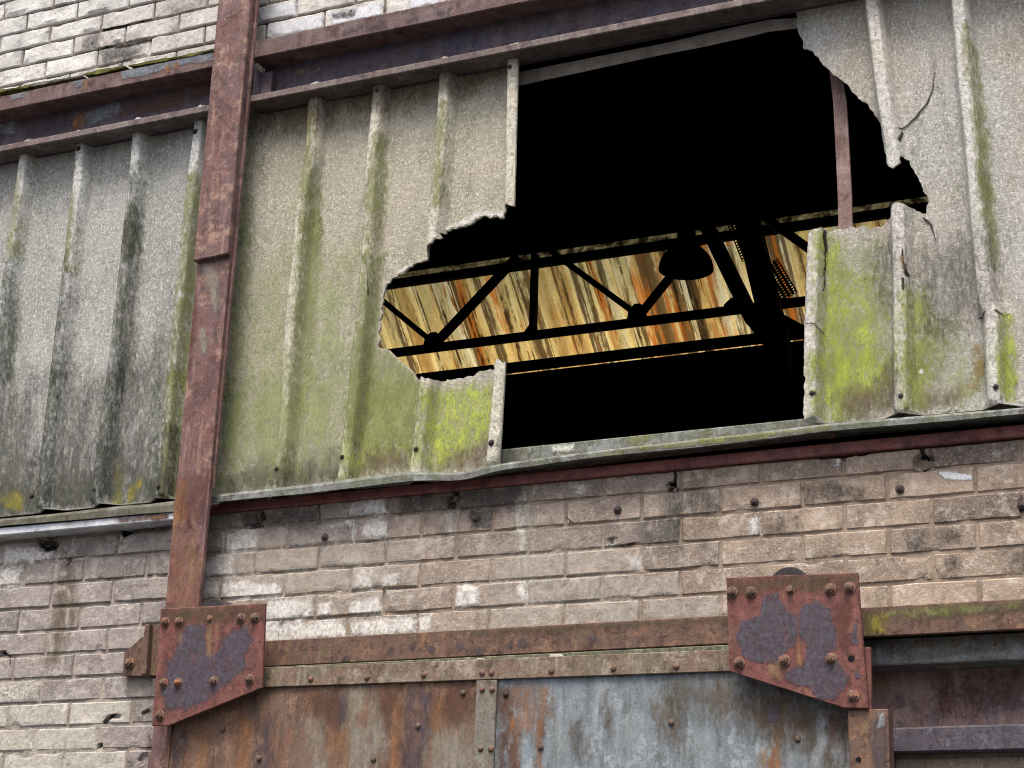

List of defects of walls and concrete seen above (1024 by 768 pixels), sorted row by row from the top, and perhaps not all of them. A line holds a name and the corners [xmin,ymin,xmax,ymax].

crack [898,59,939,142]
spalling [428,211,503,242]
leakage [978,172,999,269]
leakage [0,269,17,379]
leakage [38,259,67,486]
leakage [93,373,123,478]
leakage [155,368,187,499]
leakage [278,213,323,479]
leakage [346,246,386,445]
corrosion [119,473,259,657]
corrosion [496,687,551,768]
corrosion [653,680,887,768]